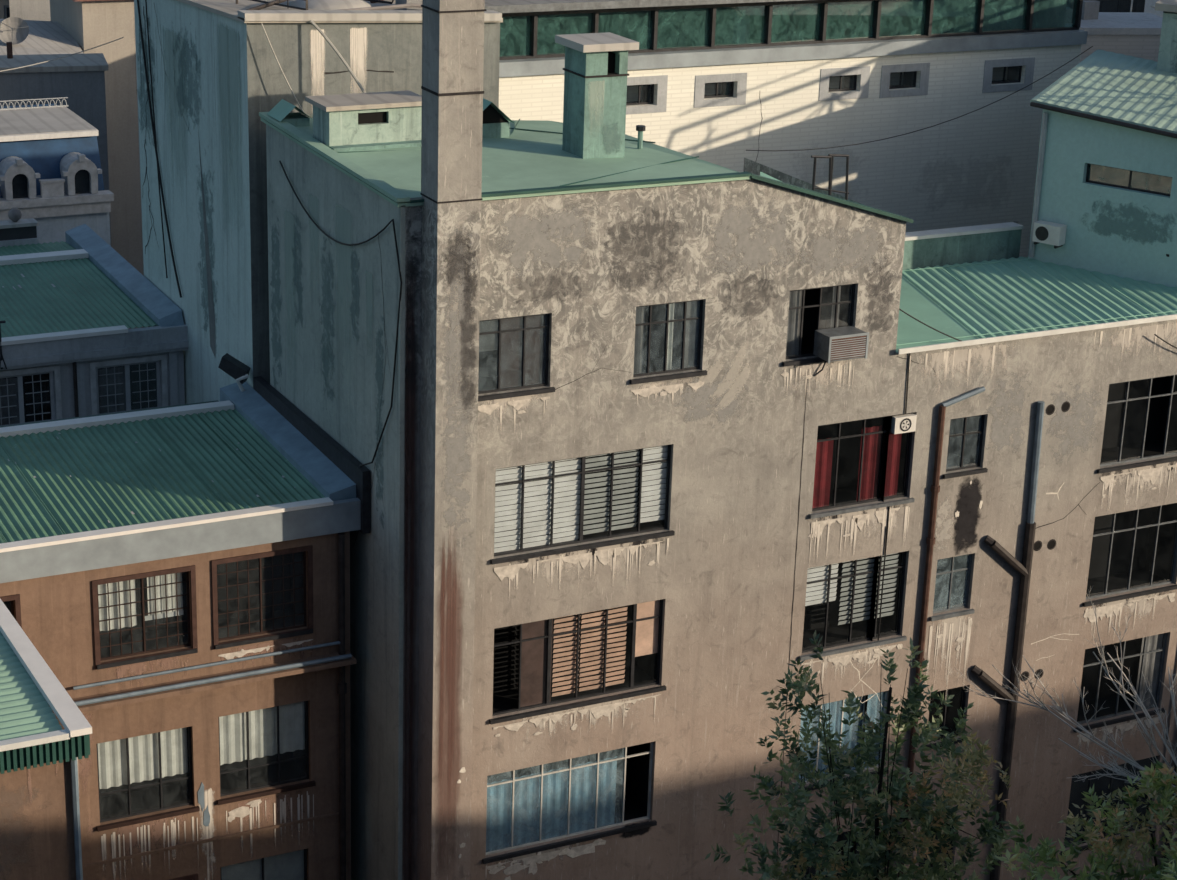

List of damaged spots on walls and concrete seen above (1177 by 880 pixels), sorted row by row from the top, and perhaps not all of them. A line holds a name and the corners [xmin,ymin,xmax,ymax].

leakage [198,132,215,356]
leakage [705,200,886,277]
rust [439,556,461,824]
leakage [77,714,93,791]
leakage [199,788,215,880]